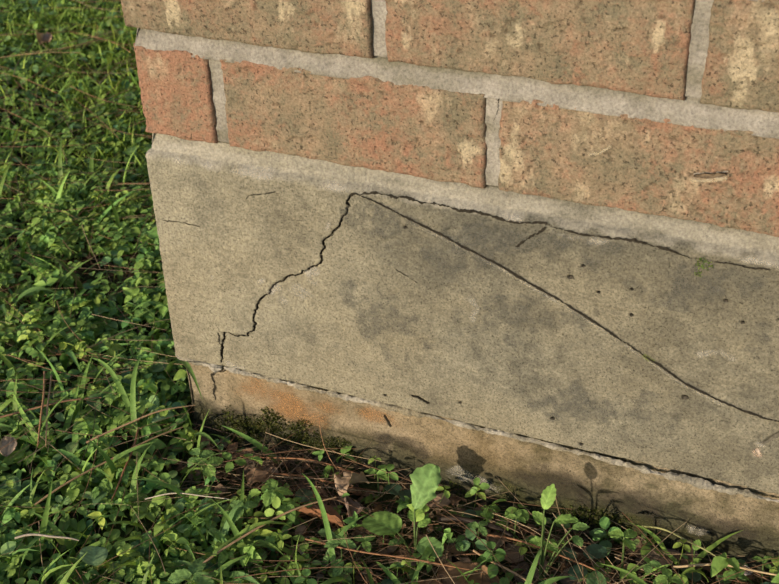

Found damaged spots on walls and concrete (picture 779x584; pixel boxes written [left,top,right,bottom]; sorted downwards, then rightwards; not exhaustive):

crack [210,191,779,422]